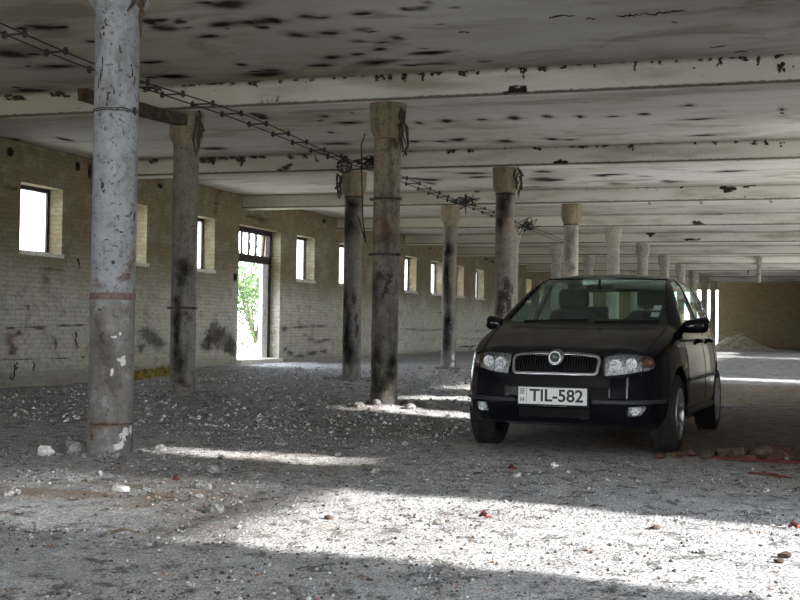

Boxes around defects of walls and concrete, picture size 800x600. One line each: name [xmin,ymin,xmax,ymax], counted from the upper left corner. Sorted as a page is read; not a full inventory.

mould [143,19,194,30]
mould [244,18,279,29]
water stain [0,51,41,67]
peeling [693,55,761,69]
peeling [332,73,407,82]
spalling [503,67,527,95]
spalling [719,185,756,193]
water stain [497,192,511,229]
water stain [173,260,192,380]
water stain [372,348,396,395]
peeling [113,425,132,450]